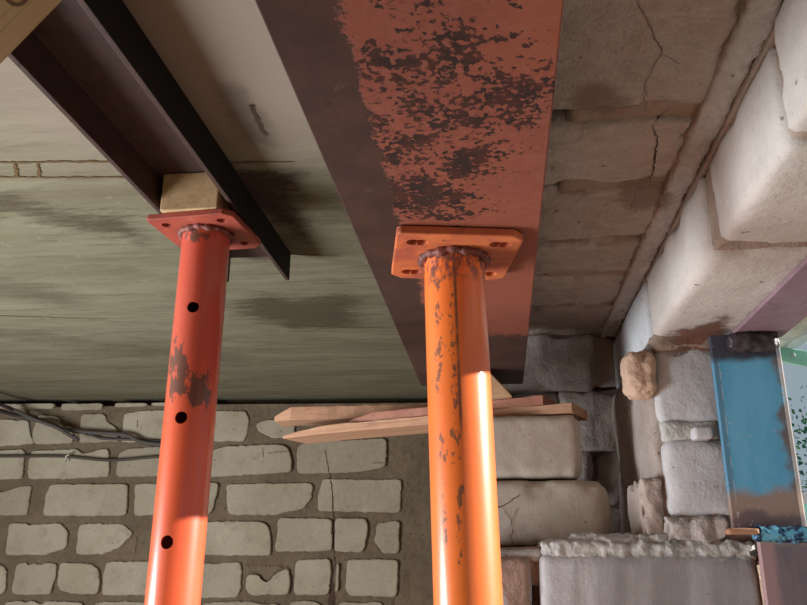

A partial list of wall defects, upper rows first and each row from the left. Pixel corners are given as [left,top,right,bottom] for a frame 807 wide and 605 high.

crack [637,1,681,182]
crack [325,450,336,605]
crack [498,494,520,544]